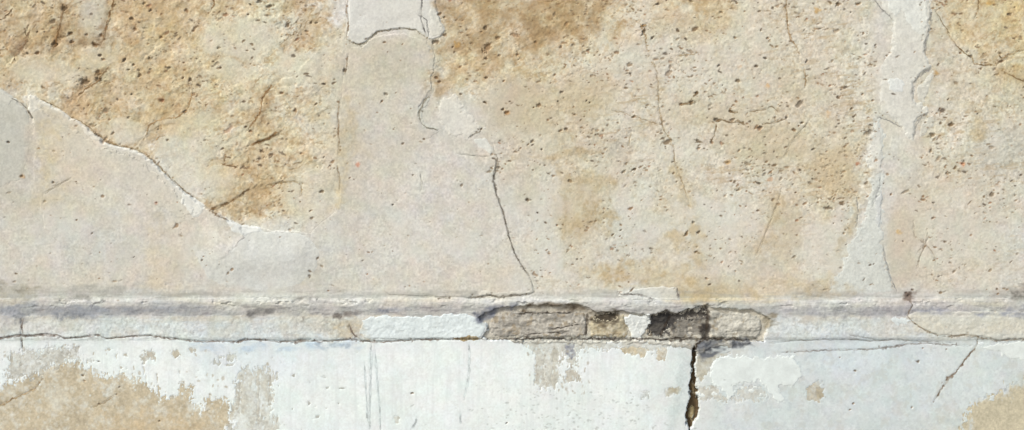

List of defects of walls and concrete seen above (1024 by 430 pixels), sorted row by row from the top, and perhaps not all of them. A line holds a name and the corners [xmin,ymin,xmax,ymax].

spalling [0,0,710,263]
flaking render [836,0,1024,294]
peeling [0,343,295,430]
crack [0,130,1024,430]
spalling [362,286,826,405]
peeling [958,375,1024,430]